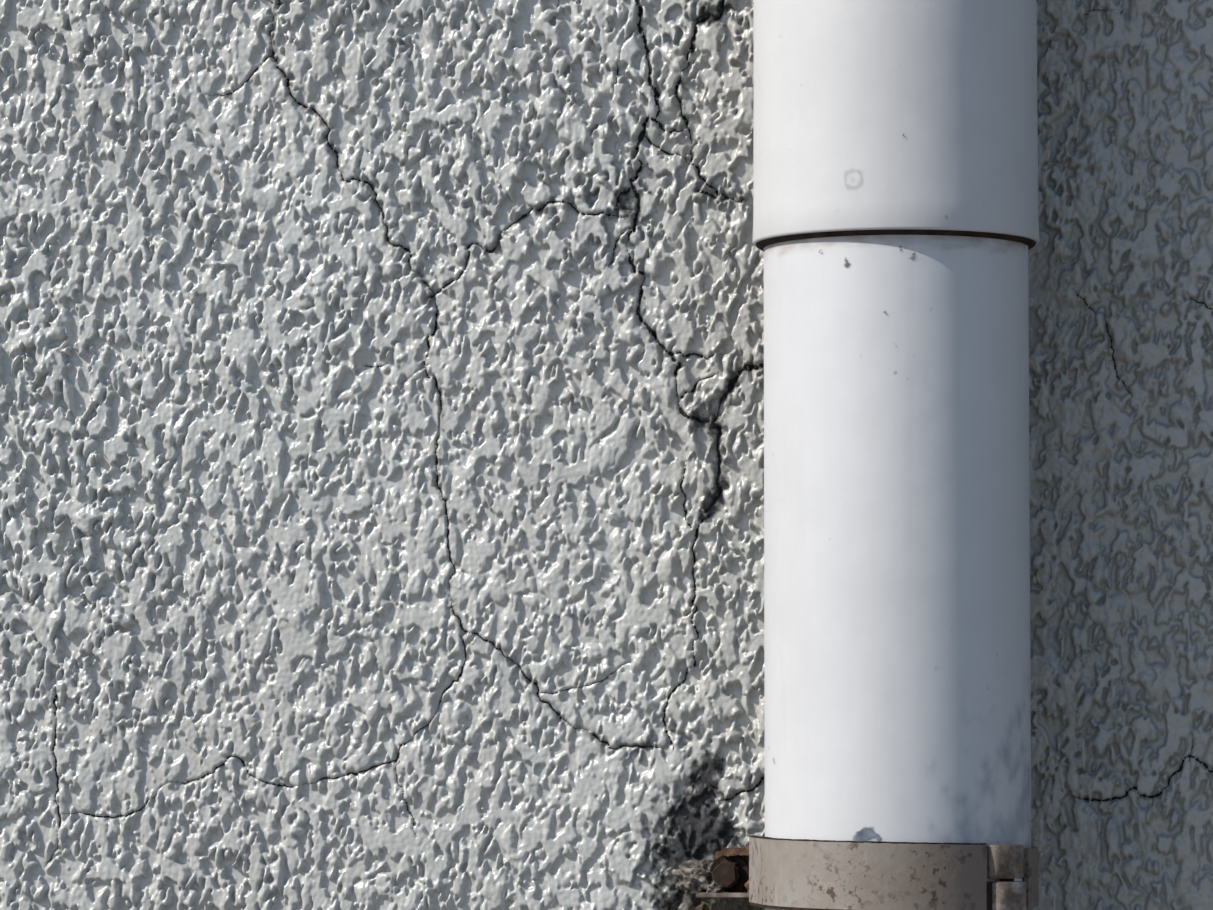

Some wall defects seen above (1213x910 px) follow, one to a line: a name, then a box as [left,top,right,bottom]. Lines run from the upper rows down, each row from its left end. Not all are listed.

crack [45,0,765,867]
crack [1061,732,1213,802]
damp [650,749,744,910]
rust [672,880,842,910]
rust [987,881,998,910]